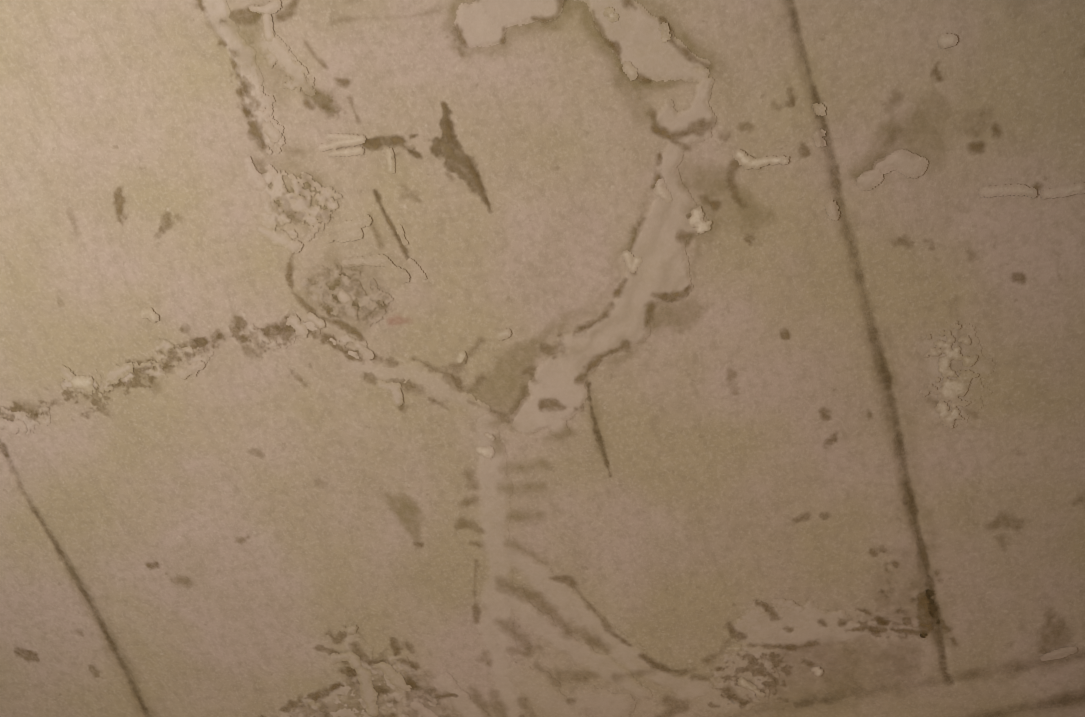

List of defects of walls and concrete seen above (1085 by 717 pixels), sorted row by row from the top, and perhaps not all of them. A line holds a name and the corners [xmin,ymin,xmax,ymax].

crack [0,264,491,435]
water stain [197,0,372,253]
crack [375,191,427,280]
water stain [262,0,885,717]